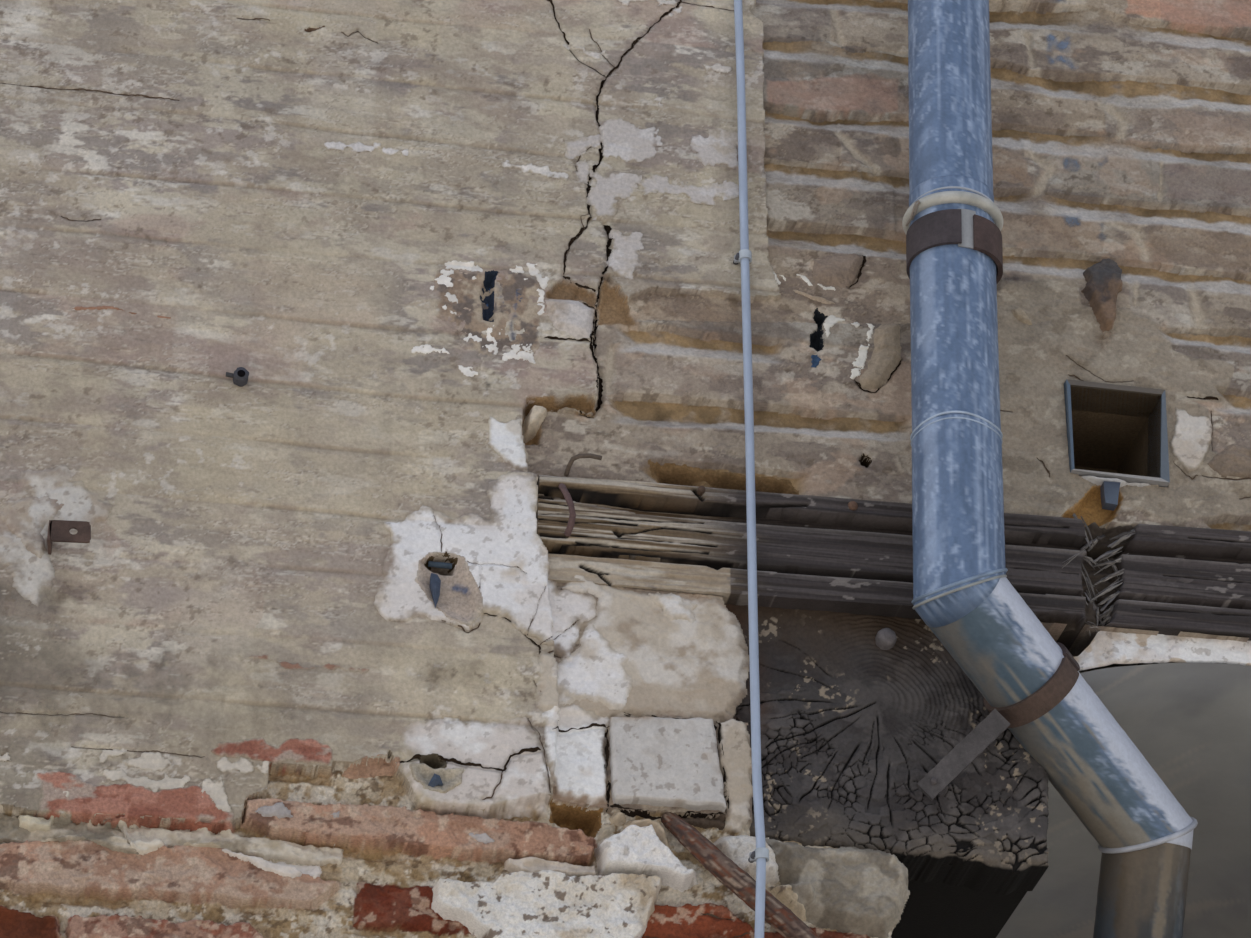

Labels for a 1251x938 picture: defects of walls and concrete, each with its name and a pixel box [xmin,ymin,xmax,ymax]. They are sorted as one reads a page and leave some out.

peeling [324,141,409,156]
peeling [428,117,739,360]
crack [544,0,734,418]
flaking render [0,737,344,879]
flaking render [342,754,400,779]
flaking render [469,833,495,844]